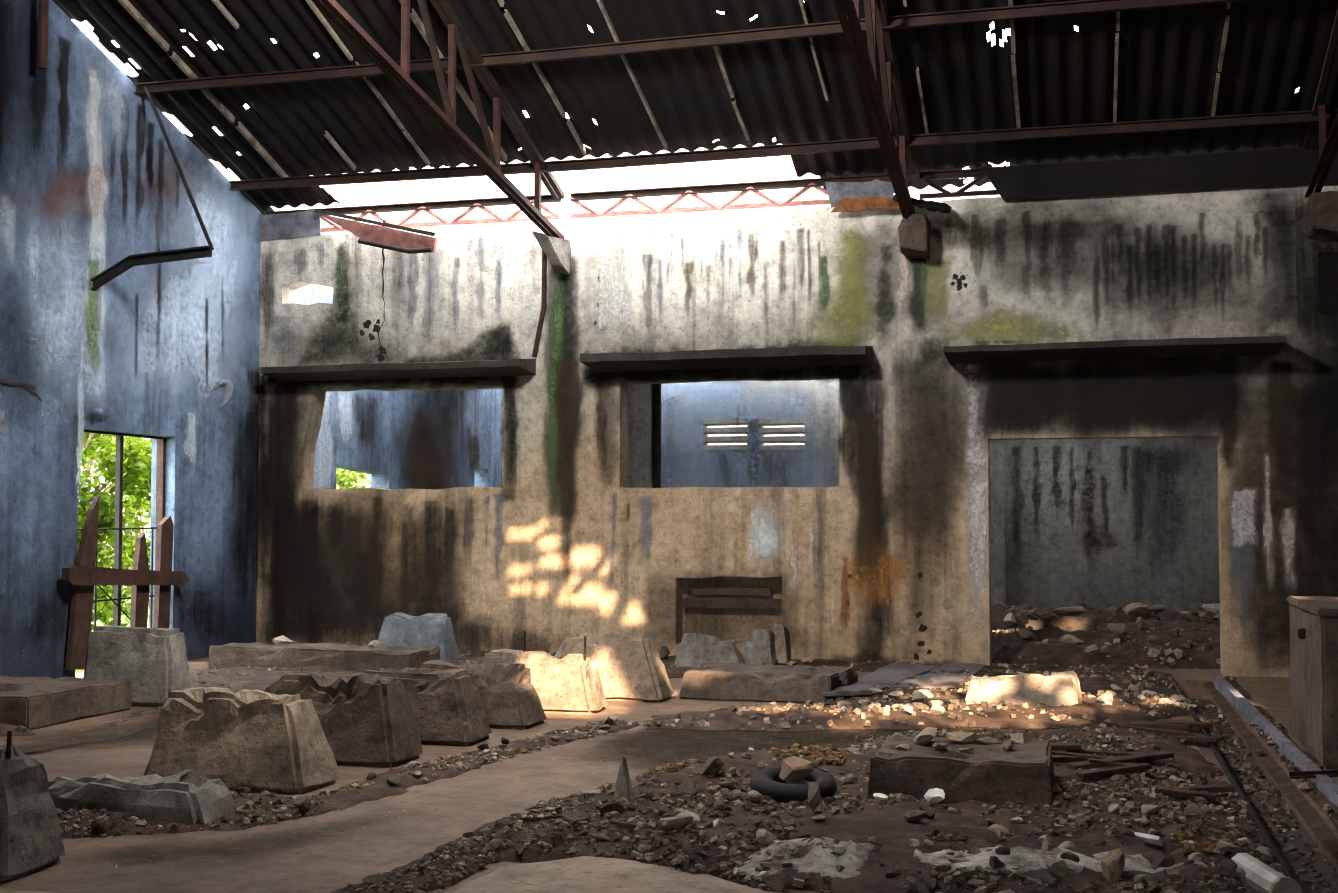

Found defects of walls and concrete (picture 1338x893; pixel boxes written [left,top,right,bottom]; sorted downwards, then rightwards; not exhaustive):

damp [26,38,70,161]
damp [29,72,226,479]
damp [598,233,629,328]
damp [643,254,662,311]
damp [671,230,758,311]
damp [1095,226,1194,309]
crack [0,378,42,402]
damp [547,283,582,572]
damp [598,403,607,452]
damp [1221,394,1237,466]
damp [1053,447,1074,518]
damp [1120,446,1179,527]